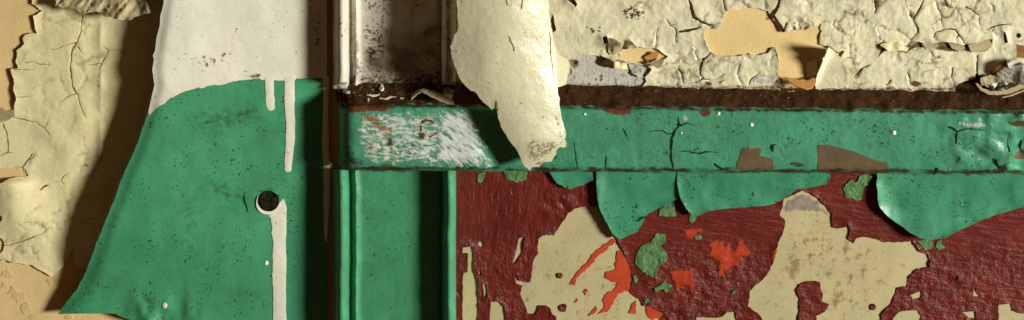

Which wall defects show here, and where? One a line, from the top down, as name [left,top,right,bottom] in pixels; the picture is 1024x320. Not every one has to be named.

crack [0,18,116,191]
peeling [0,0,330,320]
crack [623,116,723,170]
crack [654,0,726,46]
crack [678,53,758,85]
peeling [704,8,845,90]
crack [771,0,785,33]
peeling [817,144,889,173]
crack [910,0,1007,81]
peeling [462,241,505,320]
peeling [512,206,663,320]
peeling [748,190,930,320]